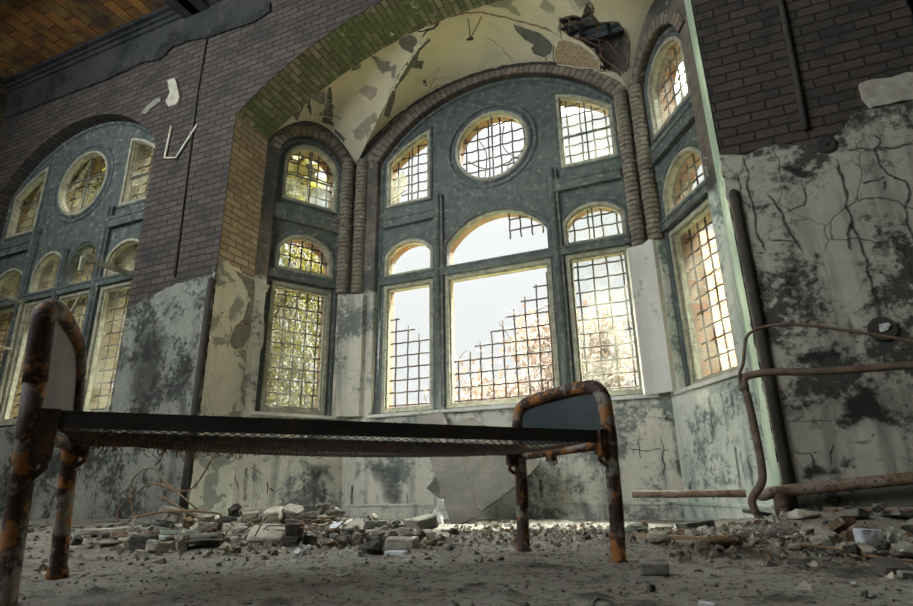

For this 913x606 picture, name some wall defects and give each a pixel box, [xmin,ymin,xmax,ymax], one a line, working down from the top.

spalling [488,0,600,72]
spalling [291,34,432,143]
crack [742,157,807,253]
damp [781,166,818,180]
crack [836,135,913,301]
spalling [229,270,270,350]
damp [796,349,839,364]
damp [372,465,408,503]